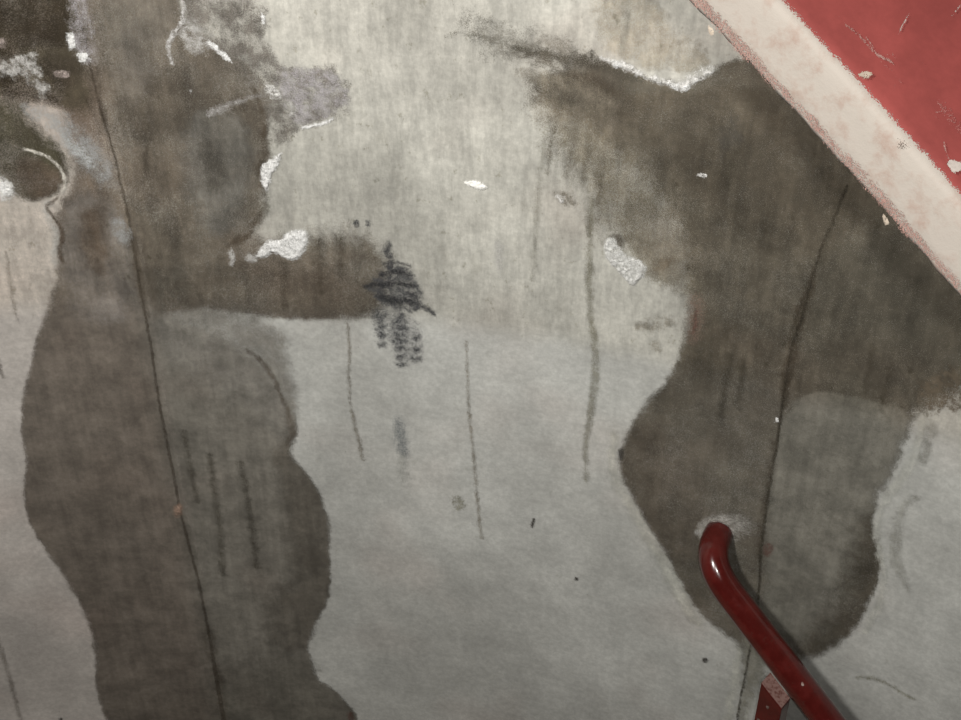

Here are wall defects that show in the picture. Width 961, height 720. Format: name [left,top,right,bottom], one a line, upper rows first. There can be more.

peeling [24,148,67,268]
peeling [226,229,310,267]
peeling [259,153,283,215]
spalling [603,219,698,291]
crack [72,0,229,720]
water stain [0,0,397,720]
water stain [519,0,961,661]